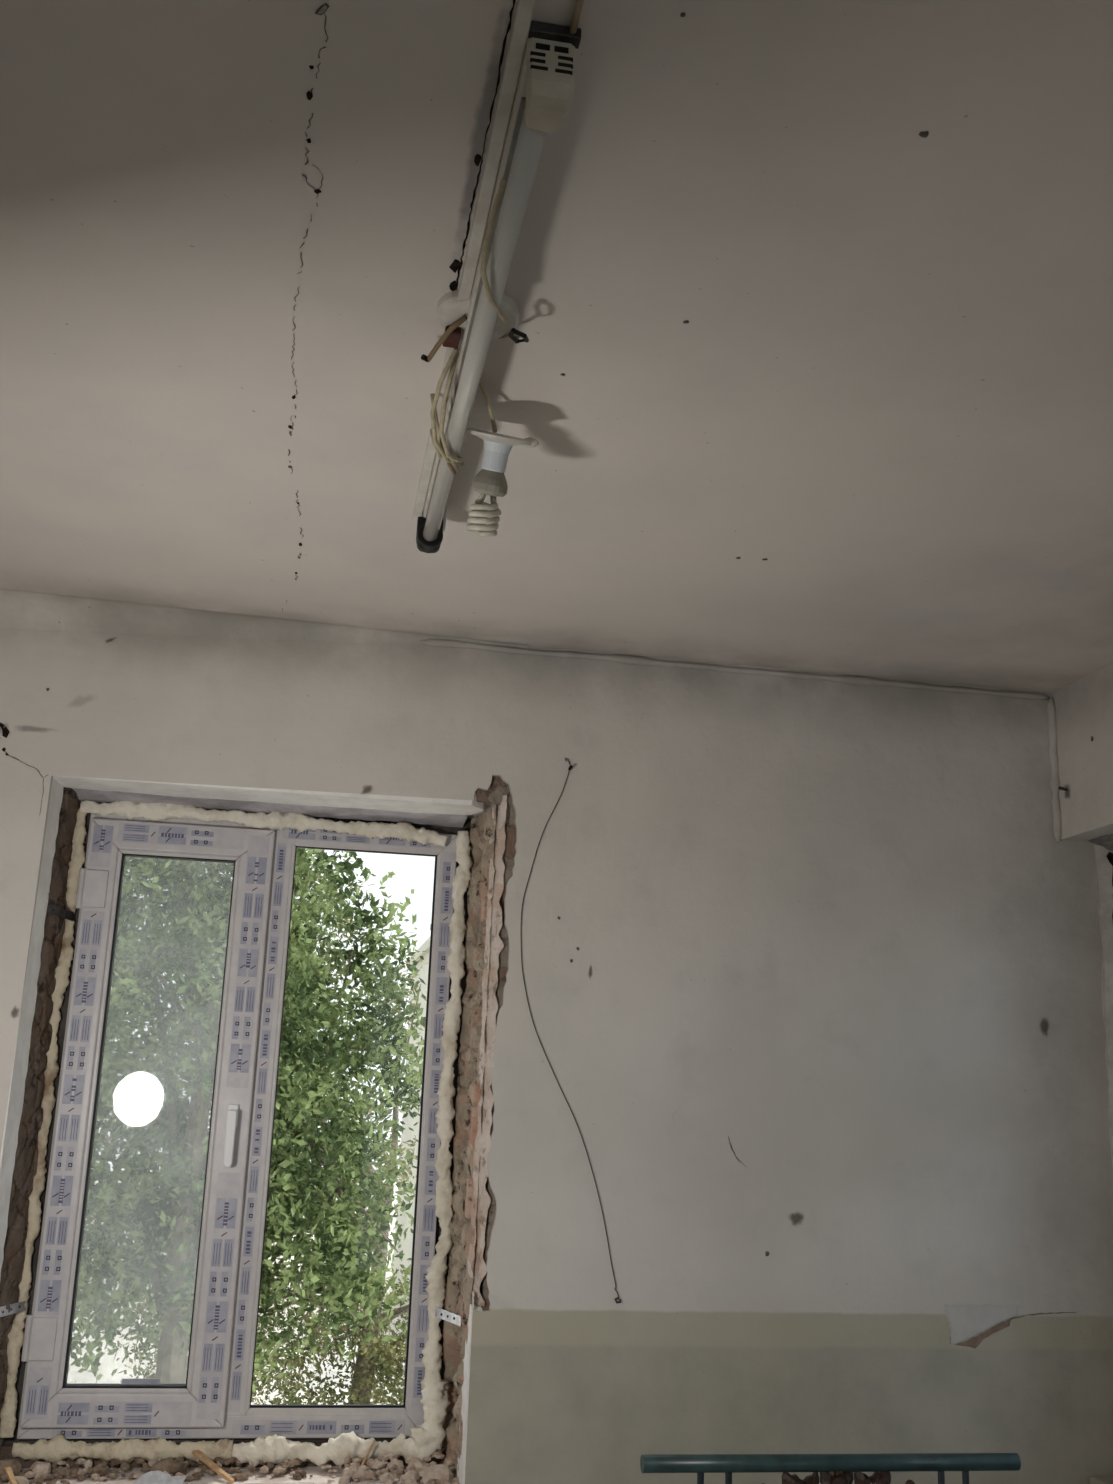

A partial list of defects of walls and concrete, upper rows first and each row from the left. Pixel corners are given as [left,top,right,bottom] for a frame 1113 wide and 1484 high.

crack [282,13,328,611]
flaking render [0,722,47,816]
flaking render [0,776,516,1478]
peeling [945,1304,1076,1348]